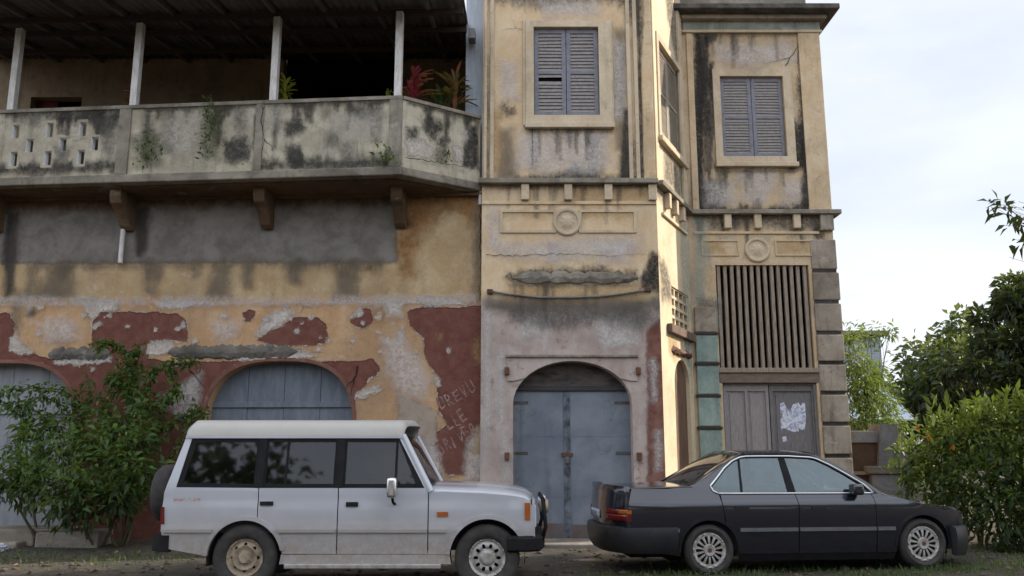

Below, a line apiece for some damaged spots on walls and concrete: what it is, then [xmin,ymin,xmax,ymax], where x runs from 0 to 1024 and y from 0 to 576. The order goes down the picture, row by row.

leakage [0,110,120,175]
leakage [134,105,256,163]
leakage [261,100,388,170]
leakage [530,0,682,201]
leakage [693,34,824,239]
peeling [0,294,506,539]